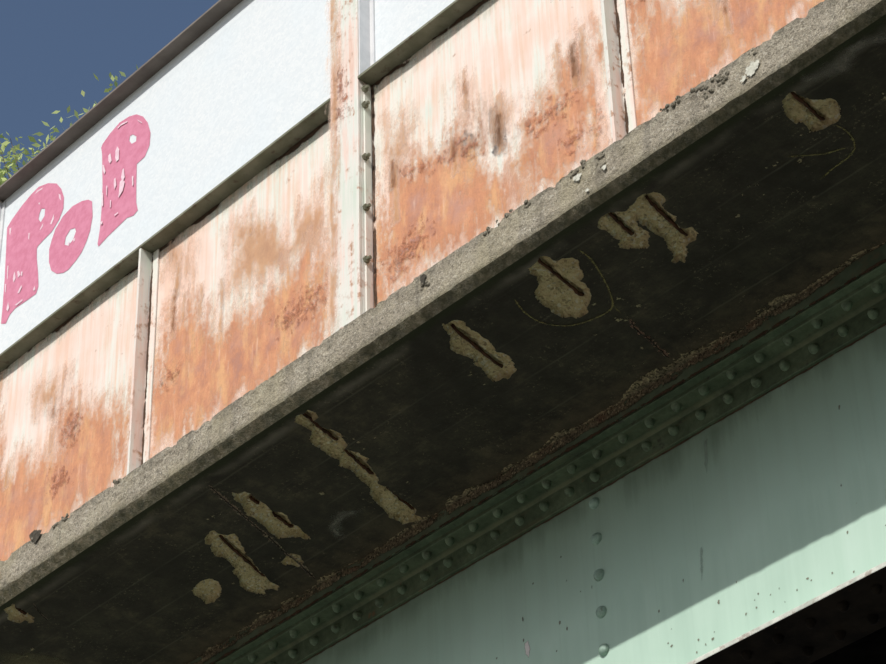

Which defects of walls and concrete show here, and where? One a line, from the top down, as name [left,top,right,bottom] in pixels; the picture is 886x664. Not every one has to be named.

rust [141,0,349,465]
rust [371,13,609,308]
spalling [598,192,698,263]
rust [614,0,824,134]
spalling [782,91,841,138]
rust [0,370,131,561]
spalling [185,242,886,664]
rust [210,259,886,664]
spalling [4,604,34,623]